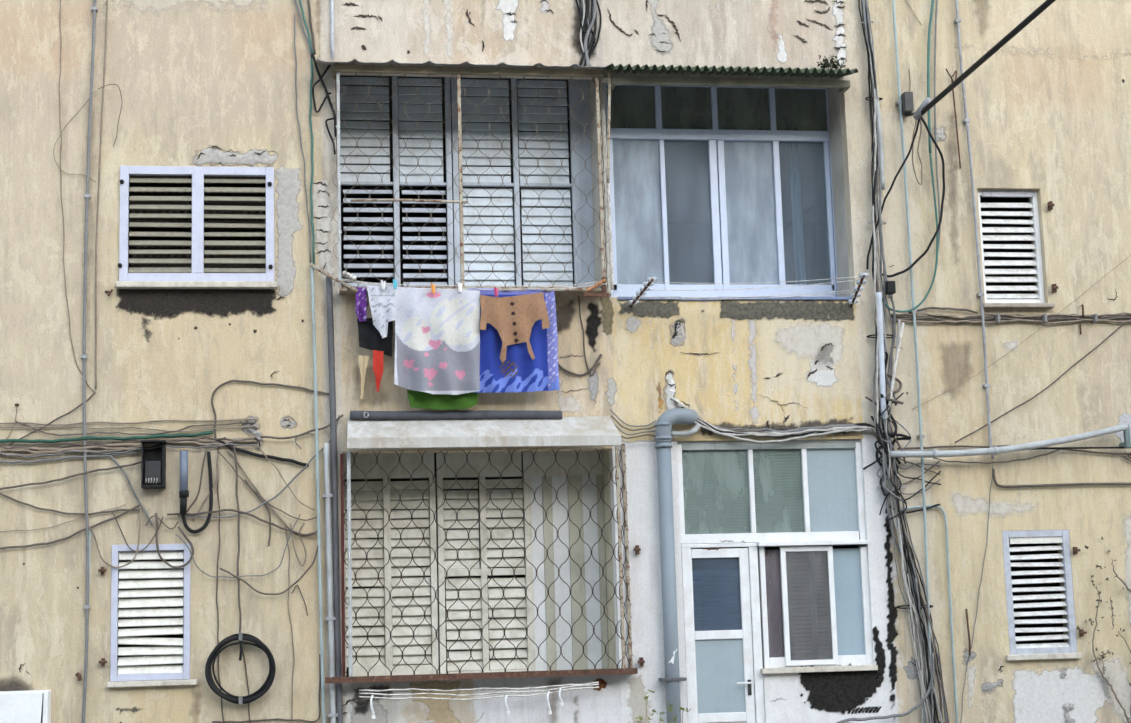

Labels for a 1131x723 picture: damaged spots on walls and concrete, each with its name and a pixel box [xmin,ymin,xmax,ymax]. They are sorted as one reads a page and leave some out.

peeling [496,0,518,41]
peeling [648,0,673,55]
peeling [777,34,788,63]
peeling [832,0,847,65]
spalling [191,145,279,167]
spalling [670,317,686,347]
peeling [778,324,842,386]
peeling [962,647,1131,723]